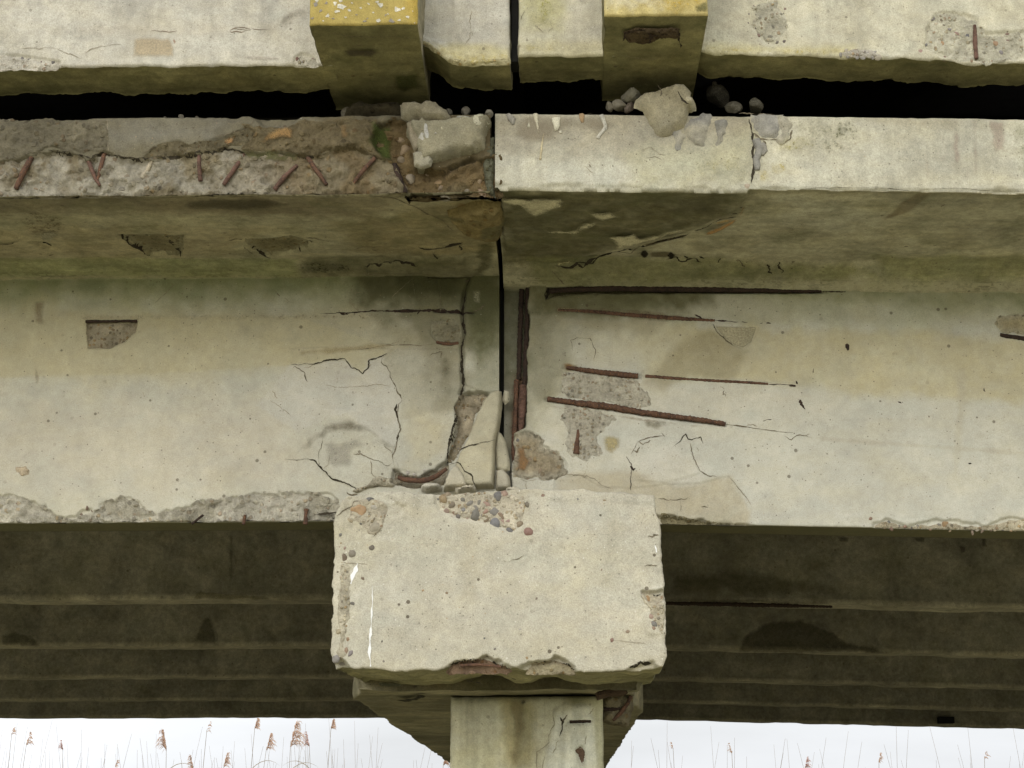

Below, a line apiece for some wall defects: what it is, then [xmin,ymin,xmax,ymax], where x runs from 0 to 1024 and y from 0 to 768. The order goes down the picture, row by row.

spalling [918,12,1024,66]
spalling [0,117,503,204]
leakage [193,201,277,209]
spalling [85,320,138,349]
crack [289,196,492,537]
spalling [510,288,768,481]
spalling [0,394,533,550]
crack [520,433,752,507]
spalling [869,517,1024,536]
spalling [332,533,364,666]